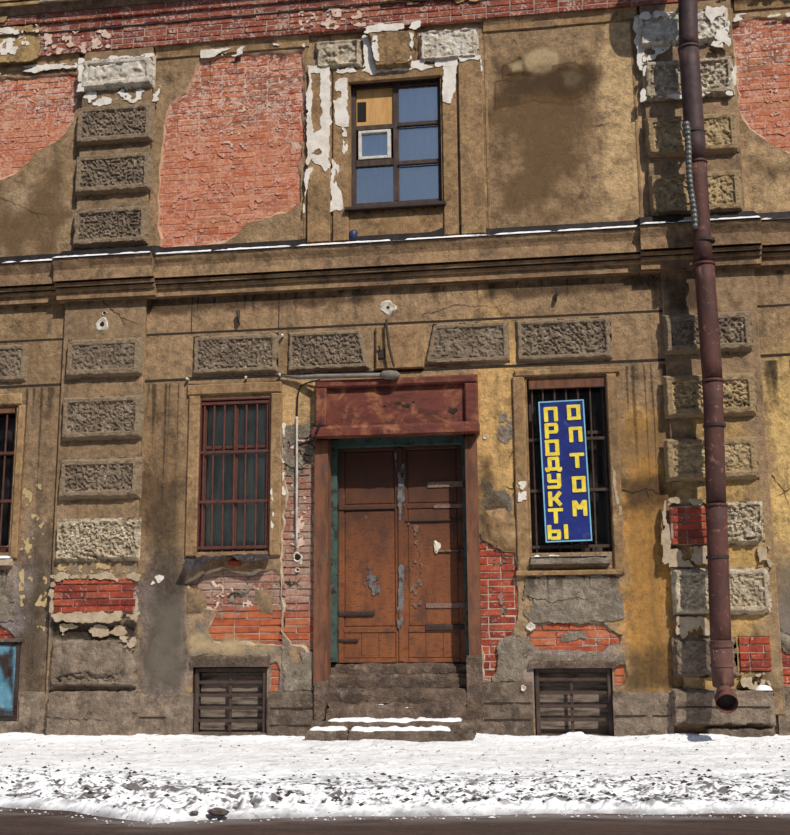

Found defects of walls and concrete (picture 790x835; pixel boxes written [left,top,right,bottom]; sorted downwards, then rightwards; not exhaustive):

flaking render [0,16,160,180]
flaking render [157,20,483,247]
leakage [488,48,594,210]
peeling [633,11,671,76]
peeling [640,88,682,102]
flaking render [705,5,790,154]
flaking render [35,563,141,650]
flaking render [185,423,315,691]
flaking render [479,540,628,691]
flaking render [660,497,708,567]
spalling [675,616,710,639]
flaking render [738,636,772,690]